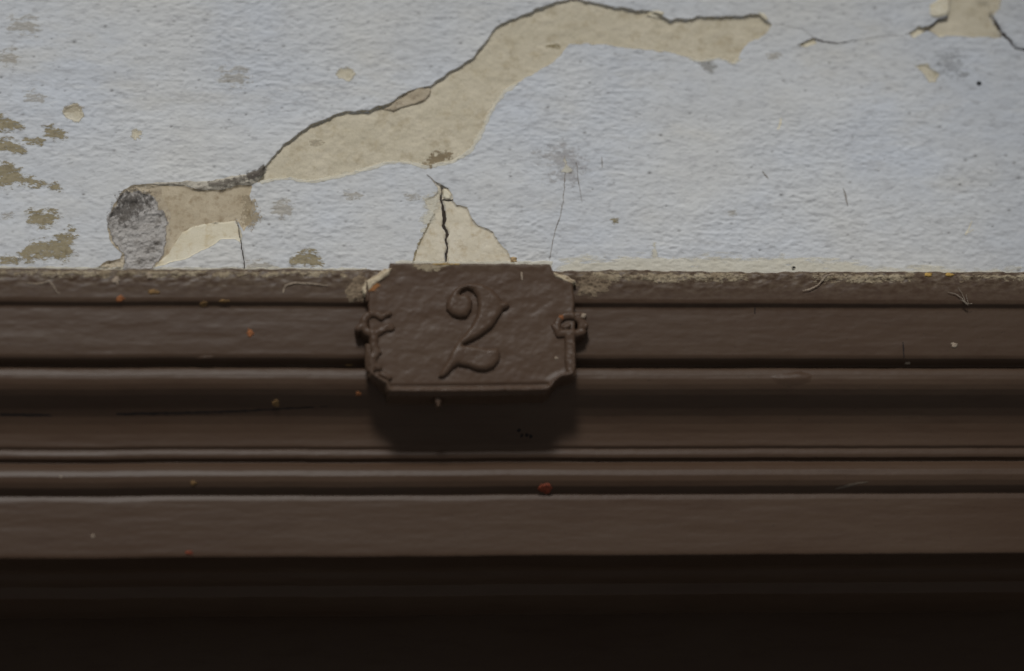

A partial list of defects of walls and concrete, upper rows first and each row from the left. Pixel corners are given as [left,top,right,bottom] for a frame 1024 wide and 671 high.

peeling [905,0,1024,51]
peeling [63,103,84,122]
peeling [99,0,772,272]